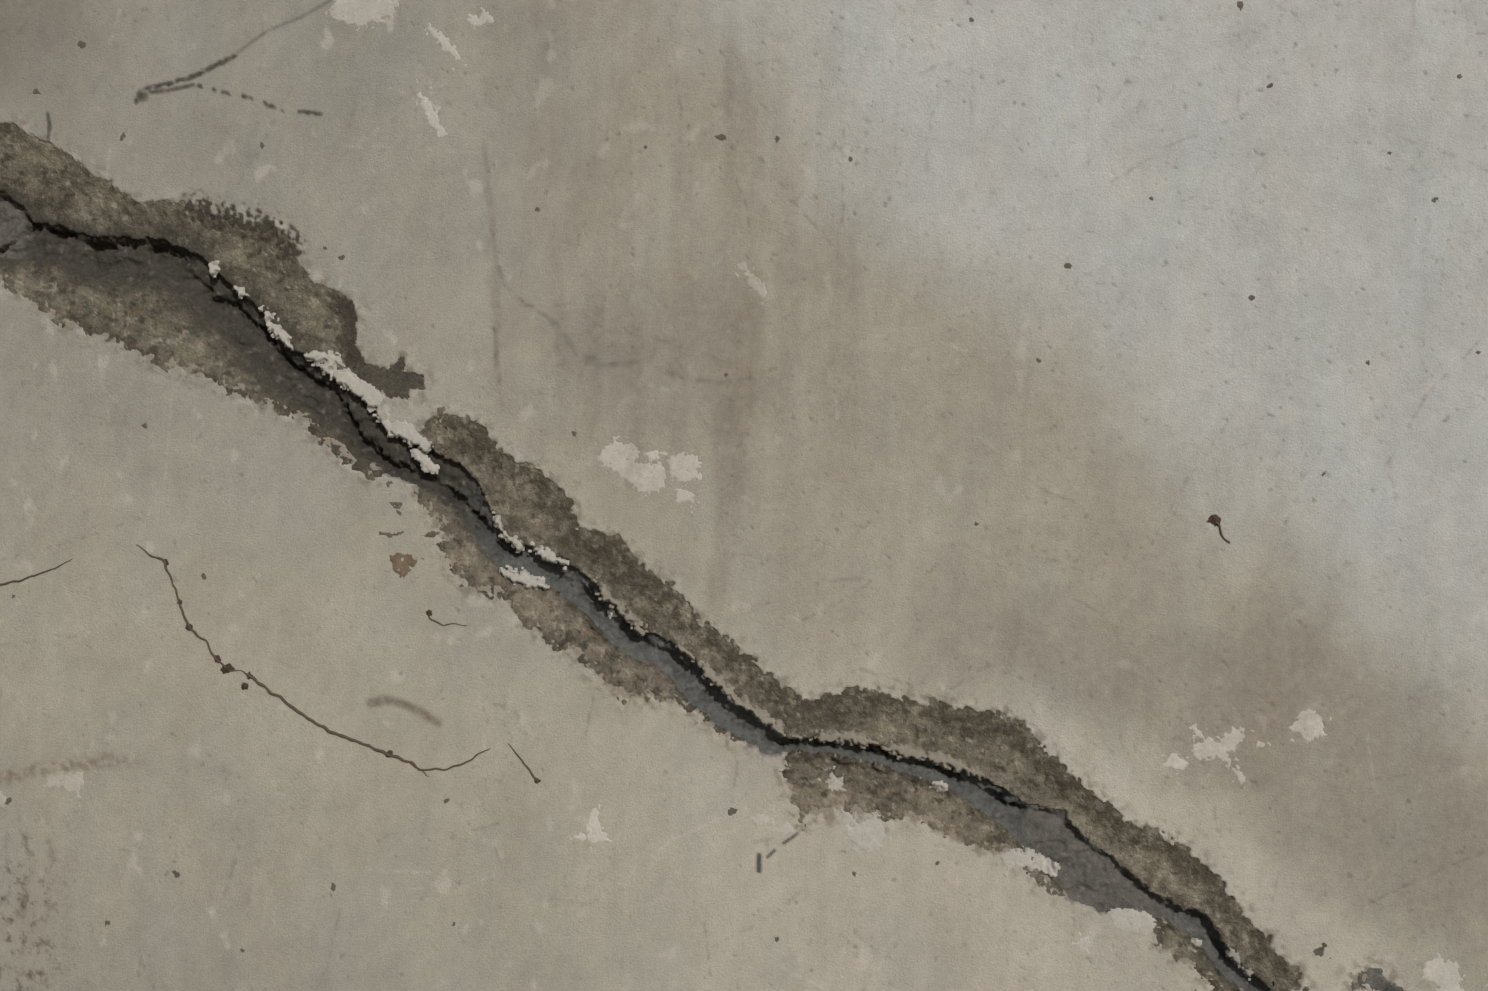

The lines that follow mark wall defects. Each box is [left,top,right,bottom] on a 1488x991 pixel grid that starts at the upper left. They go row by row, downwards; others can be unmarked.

spalling [0,123,425,408]
peeling [730,259,773,305]
peeling [39,770,92,798]
spalling [0,256,745,742]
crack [0,192,1270,991]
spalling [419,407,1331,991]
peeling [1347,950,1466,991]